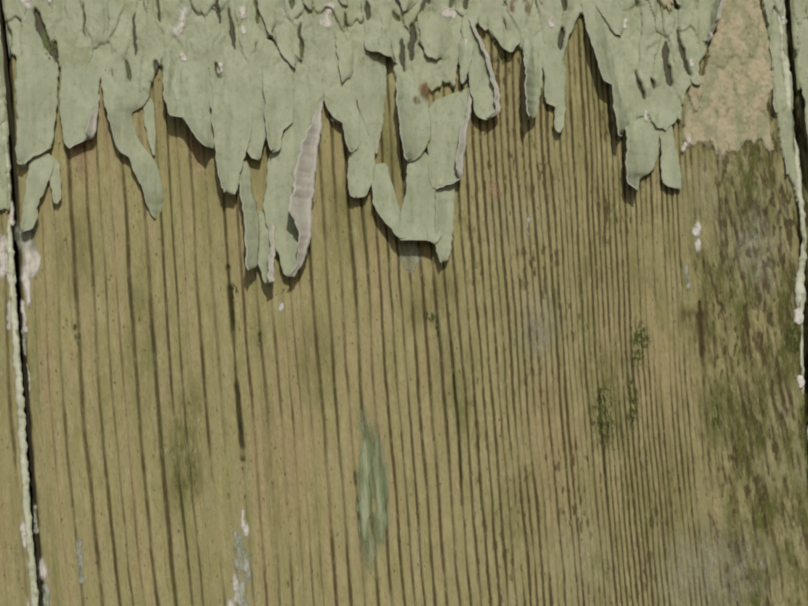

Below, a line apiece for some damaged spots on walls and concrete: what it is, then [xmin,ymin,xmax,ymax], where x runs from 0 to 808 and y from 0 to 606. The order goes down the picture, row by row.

peeling [0,0,808,355]